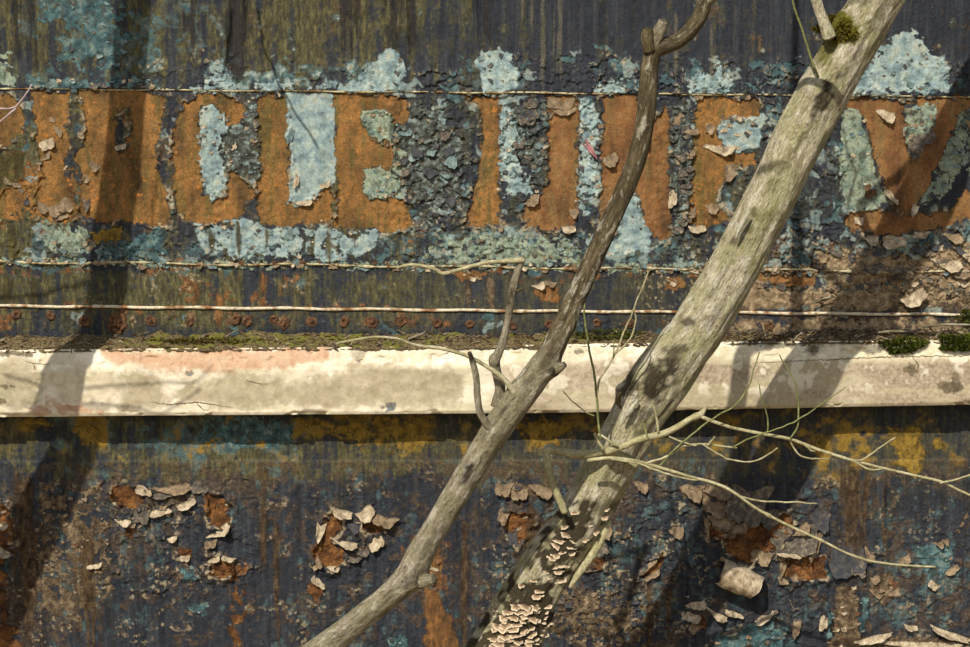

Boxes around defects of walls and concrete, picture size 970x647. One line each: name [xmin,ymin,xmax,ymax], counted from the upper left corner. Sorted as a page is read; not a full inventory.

peeling [0,46,630,303]
peeling [598,61,768,291]
peeling [729,29,970,334]
peeling [21,481,237,633]
peeling [305,504,400,601]
peeling [495,482,552,548]
peeling [634,481,649,494]
peeling [669,524,684,540]
peeling [680,483,970,647]